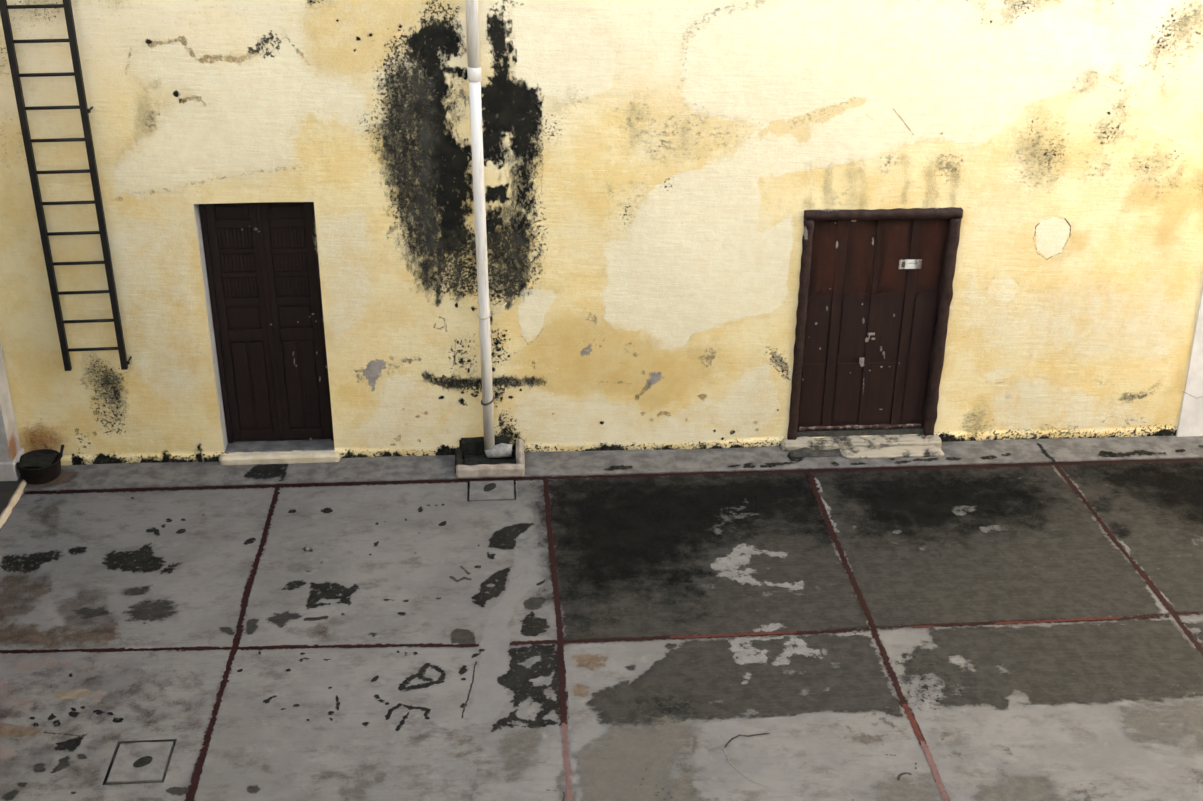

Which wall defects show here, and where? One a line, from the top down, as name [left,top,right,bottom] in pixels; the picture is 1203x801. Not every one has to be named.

flaking render [1033,216,1071,260]
leakage [90,362,129,407]
flaking render [344,356,474,456]
flaking render [509,359,781,449]
leakage [285,0,1203,732]
leakage [71,442,227,465]
leakage [0,518,186,634]